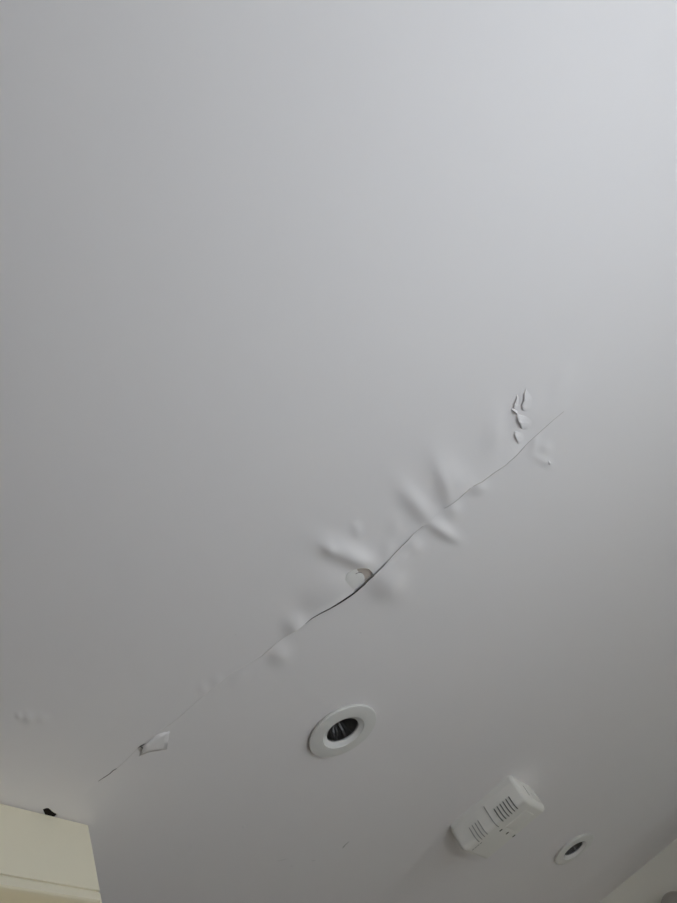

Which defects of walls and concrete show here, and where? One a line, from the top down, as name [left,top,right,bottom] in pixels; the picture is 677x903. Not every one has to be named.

crack [99,526,423,781]